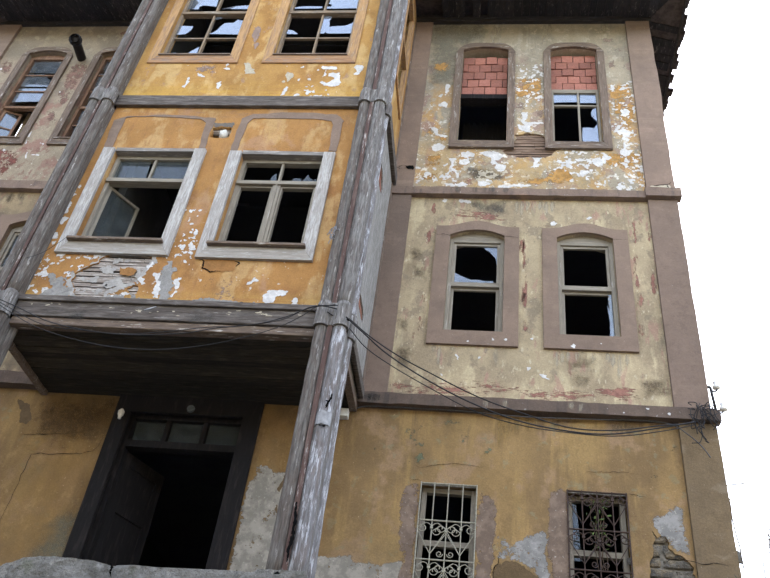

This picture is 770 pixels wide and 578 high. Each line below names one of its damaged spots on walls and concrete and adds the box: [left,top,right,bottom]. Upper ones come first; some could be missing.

peeling [182,63,230,88]
peeling [281,66,341,96]
peeling [515,64,544,132]
peeling [0,131,39,179]
peeling [52,185,81,245]
flaking render [27,254,106,305]
crack [0,433,100,521]
flaking render [230,465,285,574]
flaking render [473,489,571,578]